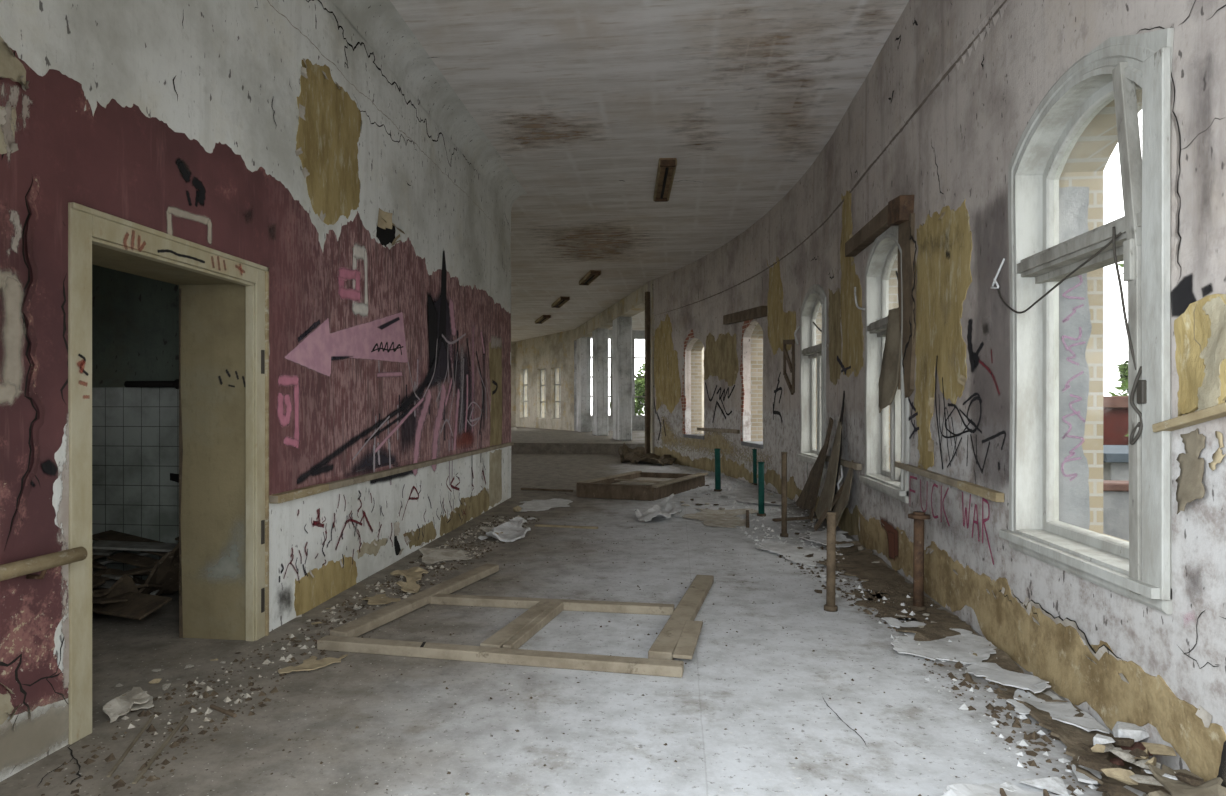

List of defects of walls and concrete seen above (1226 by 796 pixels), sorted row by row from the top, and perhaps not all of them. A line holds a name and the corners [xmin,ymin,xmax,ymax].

flaking render [295,58,362,225]
crack [306,0,474,169]
crack [1170,73,1223,283]
crack [4,173,68,553]
flaking render [654,256,802,500]
flaking render [827,190,864,385]
flaking render [914,199,972,470]
flaking render [294,449,502,618]
crack [0,637,68,725]
flaking render [815,496,1226,782]
crack [1178,610,1226,669]
crack [1217,741,1226,788]